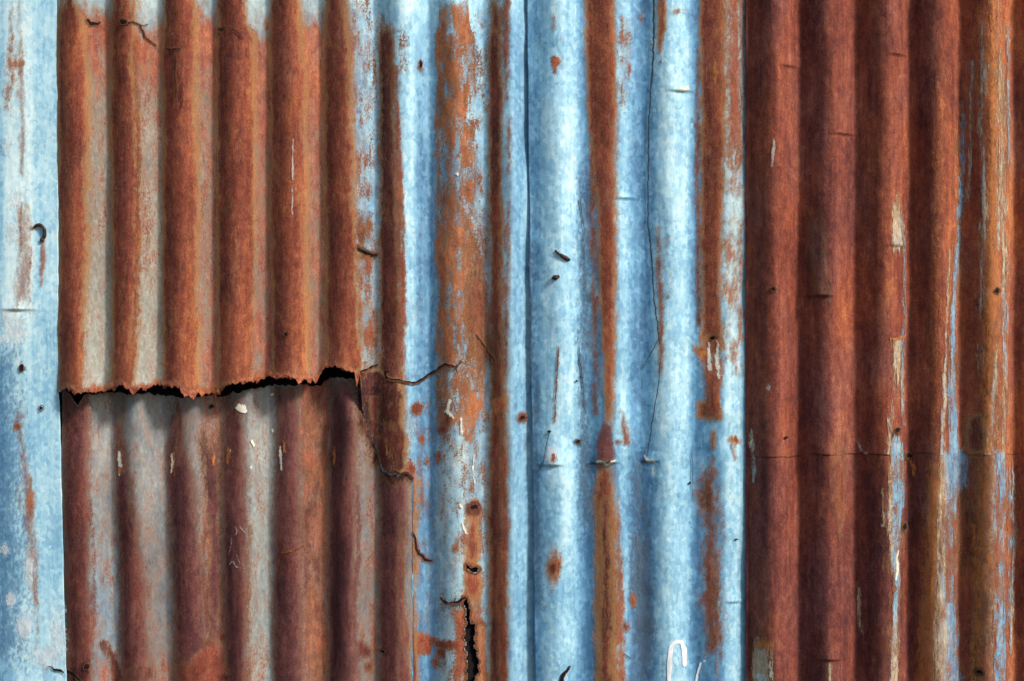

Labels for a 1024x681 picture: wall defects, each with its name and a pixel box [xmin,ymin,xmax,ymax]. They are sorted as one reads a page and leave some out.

corrosion [56,0,157,681]
corrosion [161,0,527,681]
crack [393,469,415,480]
corrosion [546,547,562,584]
corrosion [584,0,680,681]
crack [643,0,660,456]
corrosion [693,0,746,679]
corrosion [806,216,831,302]
peeling [881,192,916,681]
corrosion [901,0,1004,681]
peeling [926,21,1017,681]